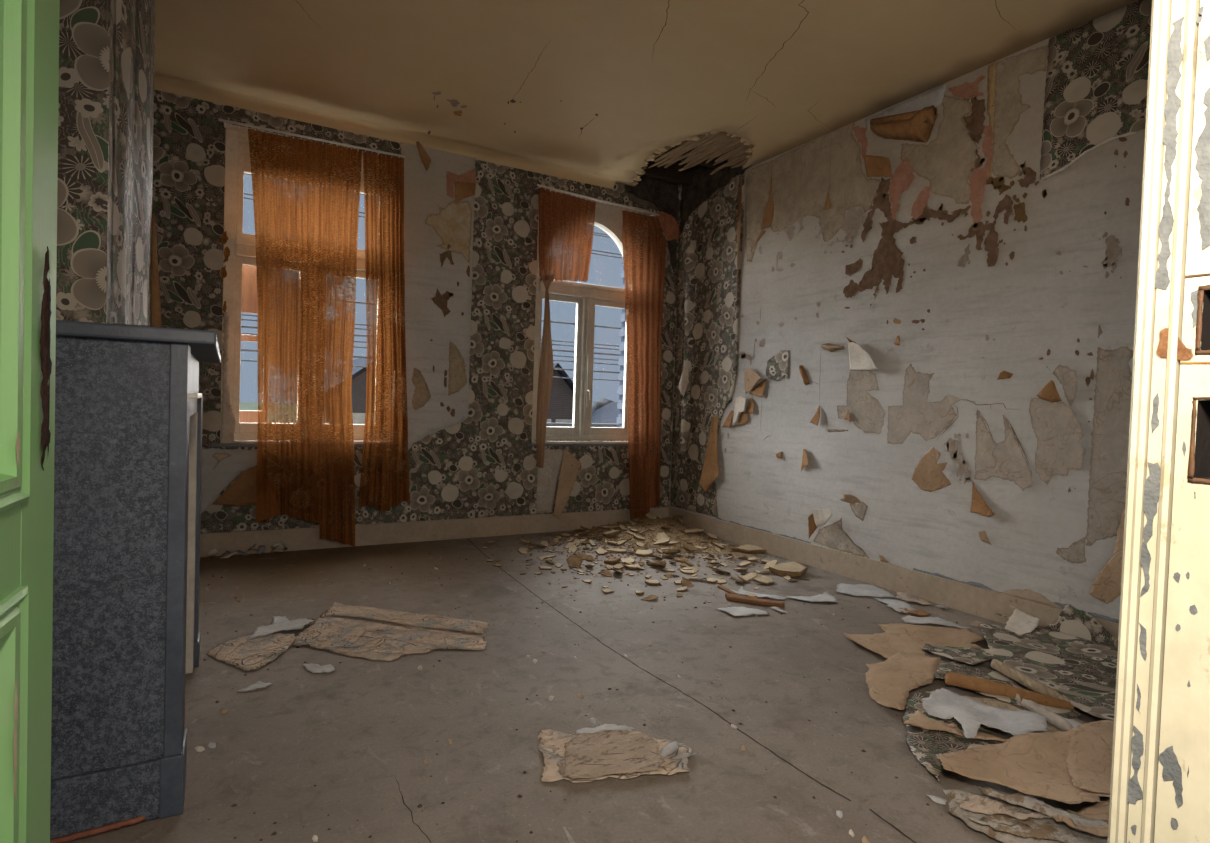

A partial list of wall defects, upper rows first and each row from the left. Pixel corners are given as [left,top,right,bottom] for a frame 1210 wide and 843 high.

peeling [822,75,1047,306]
peeling [1155,7,1204,290]
peeling [1195,87,1210,250]
flaking render [395,131,476,451]
peeling [699,308,767,492]
peeling [821,336,877,370]
peeling [911,433,995,517]
peeling [913,508,1125,623]
peeling [1140,462,1161,597]
crack [395,777,431,843]
peeling [1127,684,1144,804]
peeling [1158,746,1189,830]